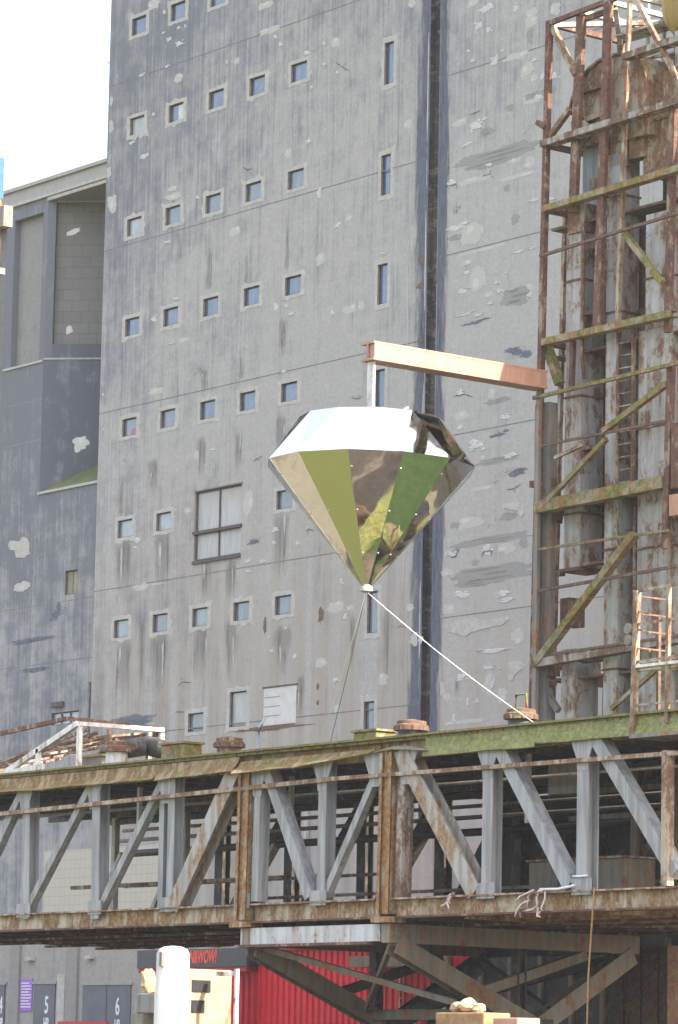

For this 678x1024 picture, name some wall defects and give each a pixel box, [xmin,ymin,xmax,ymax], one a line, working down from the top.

spalling [519,52,560,81]